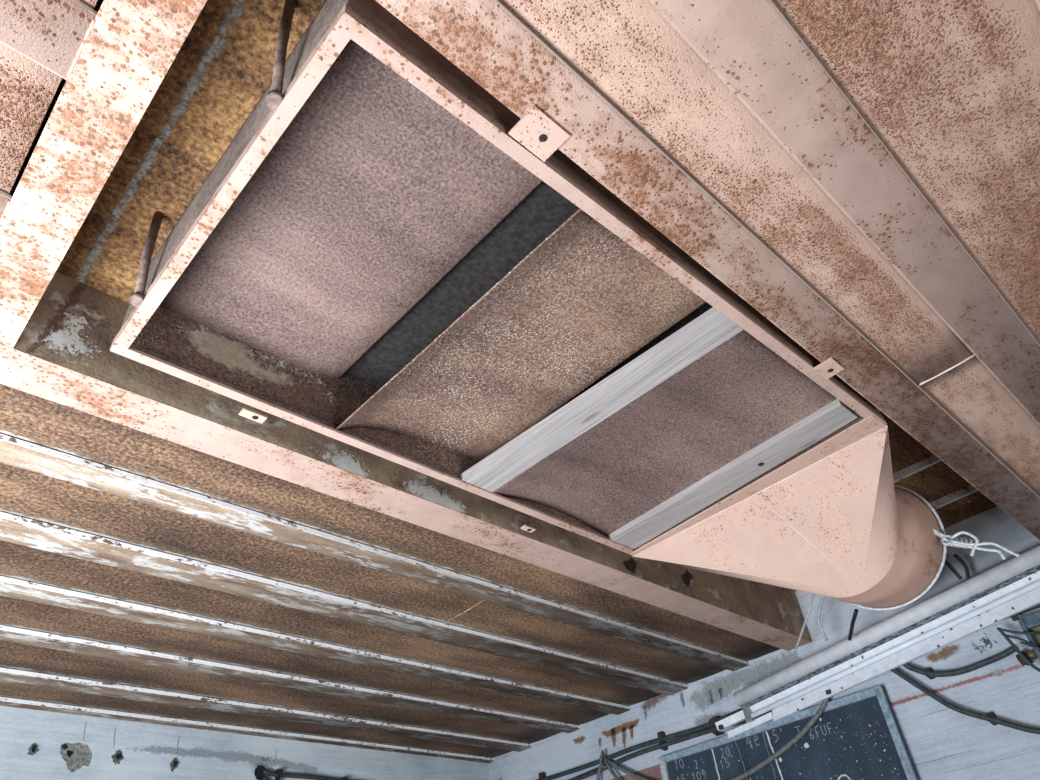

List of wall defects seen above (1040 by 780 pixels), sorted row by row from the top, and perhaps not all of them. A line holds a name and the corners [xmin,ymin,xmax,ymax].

peeling [316,448,371,477]
rust [927,646,958,662]
rust [598,719,639,748]
spalling [59,743,92,772]